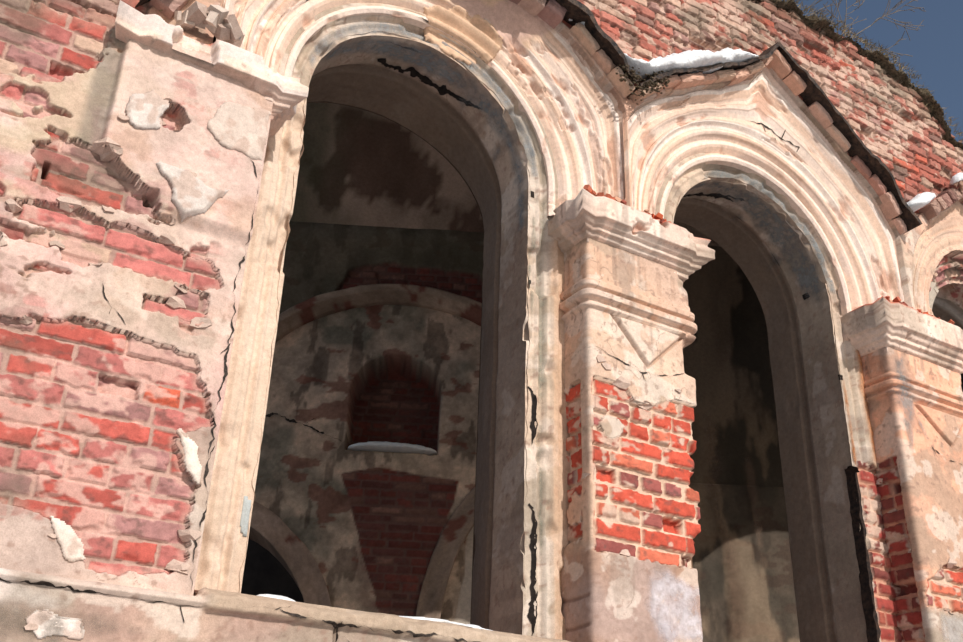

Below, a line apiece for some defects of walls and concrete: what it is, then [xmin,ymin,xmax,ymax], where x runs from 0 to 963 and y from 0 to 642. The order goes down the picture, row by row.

spalling [5,137,229,328]
spalling [0,315,214,576]